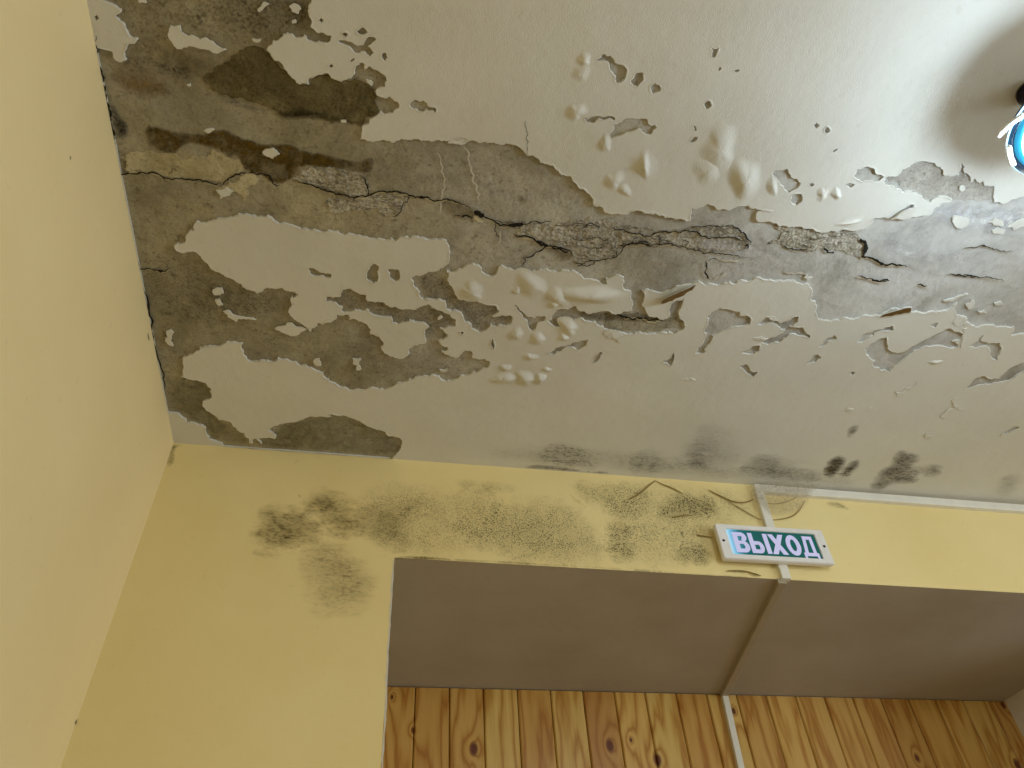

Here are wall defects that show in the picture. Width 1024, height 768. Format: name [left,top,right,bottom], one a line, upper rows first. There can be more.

water stain [146,127,372,183]
crack [121,169,751,280]
peeling [94,0,1024,459]
crack [784,246,834,254]
crack [857,238,926,288]
crack [948,245,1013,283]
water stain [825,457,856,476]